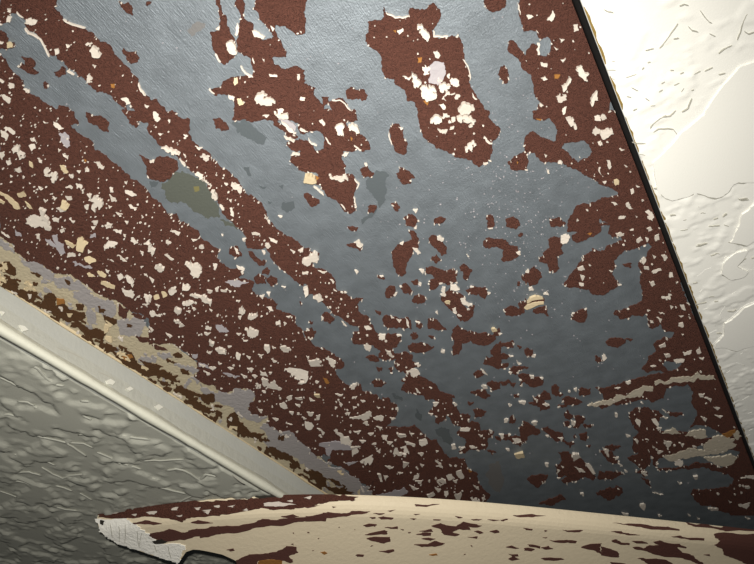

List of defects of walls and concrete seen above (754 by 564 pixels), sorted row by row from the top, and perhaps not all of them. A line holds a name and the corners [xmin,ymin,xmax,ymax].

peeling [254,91,317,146]
peeling [335,122,360,136]
peeling [411,51,476,134]
peeling [556,65,589,130]
peeling [592,114,613,140]
crack [606,4,754,155]
peeling [0,183,135,298]
crack [654,182,754,280]
peeling [144,260,249,327]
peeling [284,356,336,385]
peeling [305,412,373,475]
spalling [95,512,186,564]